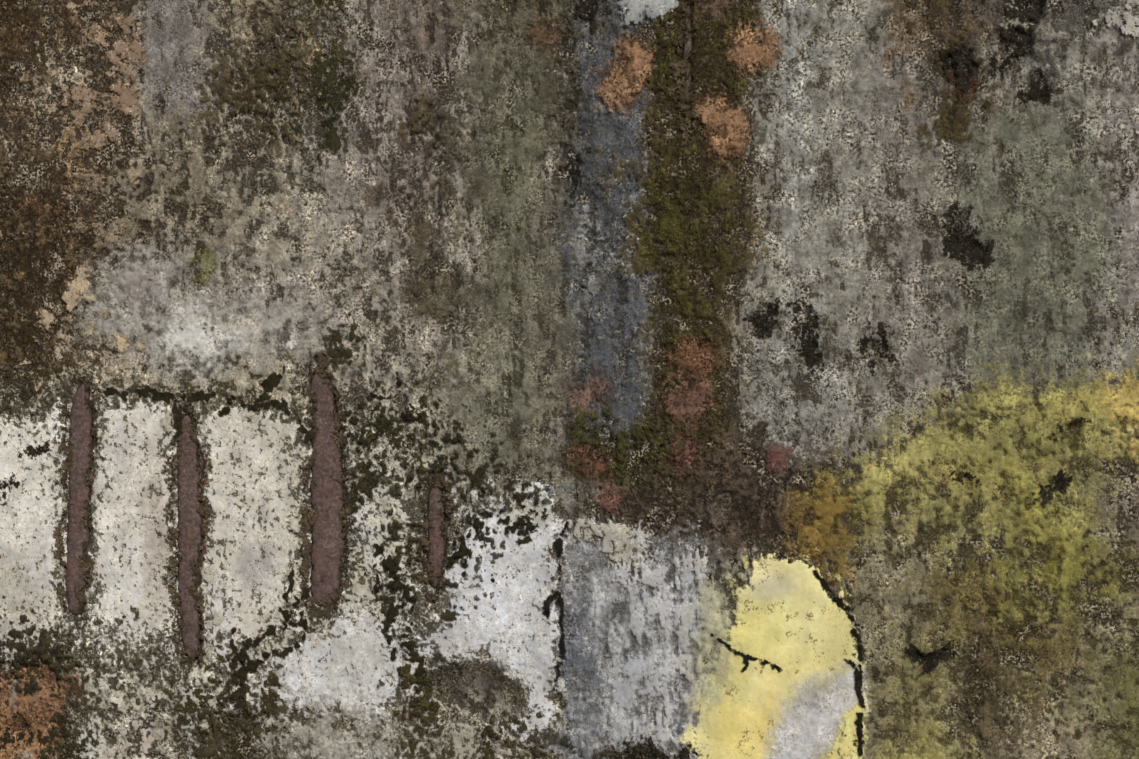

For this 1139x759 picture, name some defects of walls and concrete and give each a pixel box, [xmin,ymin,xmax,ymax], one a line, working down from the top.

peeling [32,265,147,375]
rust [309,364,347,608]
peeling [0,348,871,759]
rust [426,483,447,588]
crack [441,509,569,712]
crack [710,633,783,673]
crack [813,570,871,756]